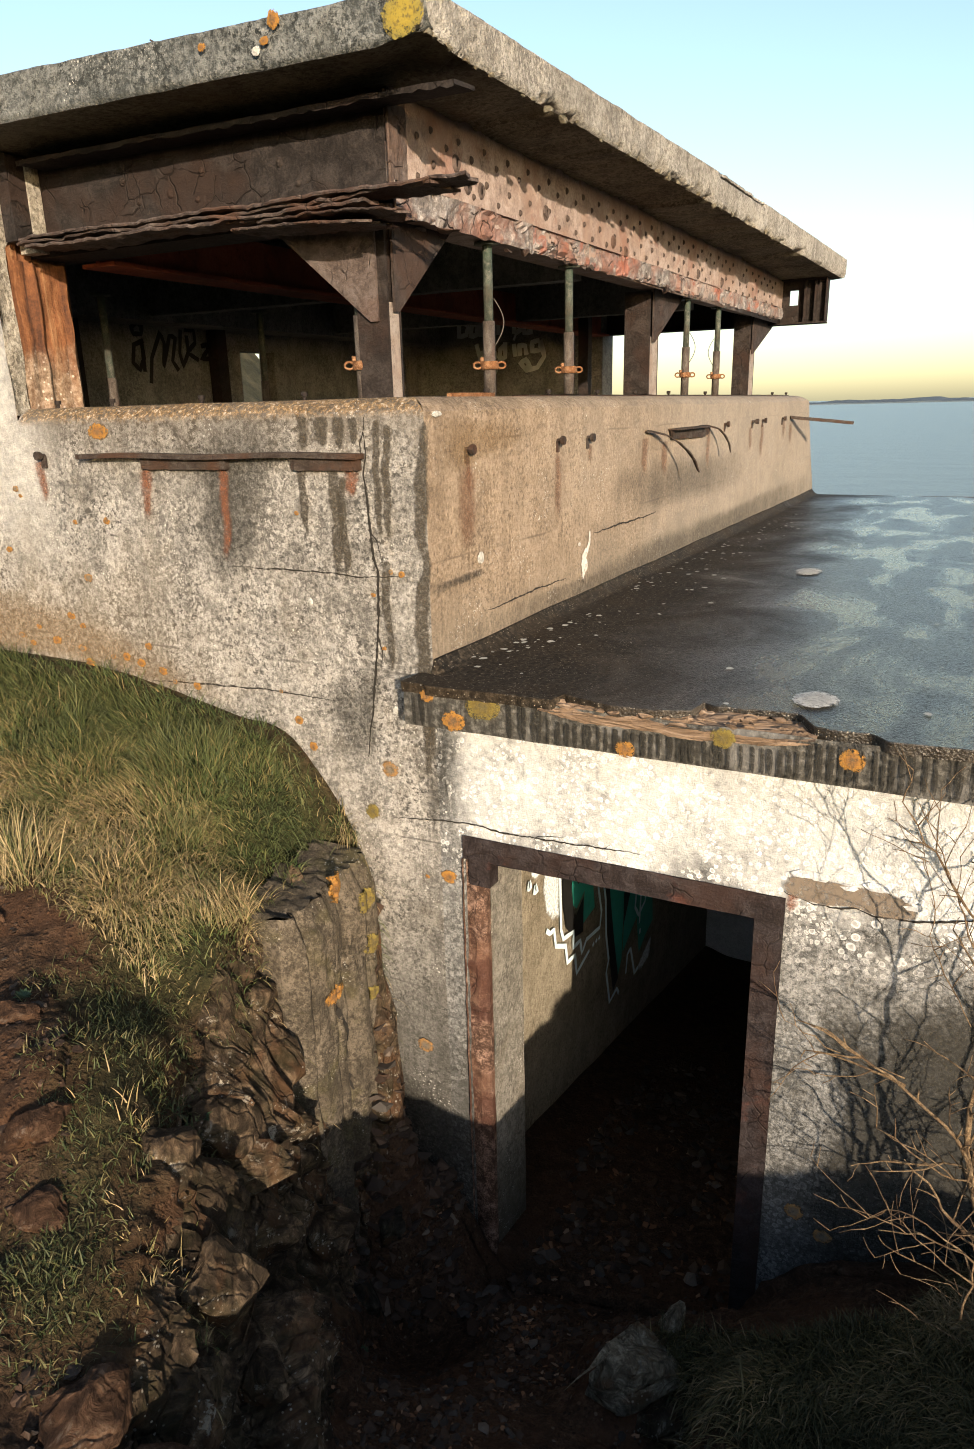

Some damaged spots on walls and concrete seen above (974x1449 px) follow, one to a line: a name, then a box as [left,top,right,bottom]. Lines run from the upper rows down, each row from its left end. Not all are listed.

corrosion [142,470,151,513]
corrosion [220,470,231,552]
leakage [328,471,351,576]
leakage [297,416,391,536]
crack [232,417,400,757]
leakage [382,562,395,671]
crack [153,680,332,701]
spalling [537,699,817,746]
leakage [506,705,974,803]
crack [394,817,640,855]
peeling [784,870,925,920]
leakage [806,1000,974,1265]